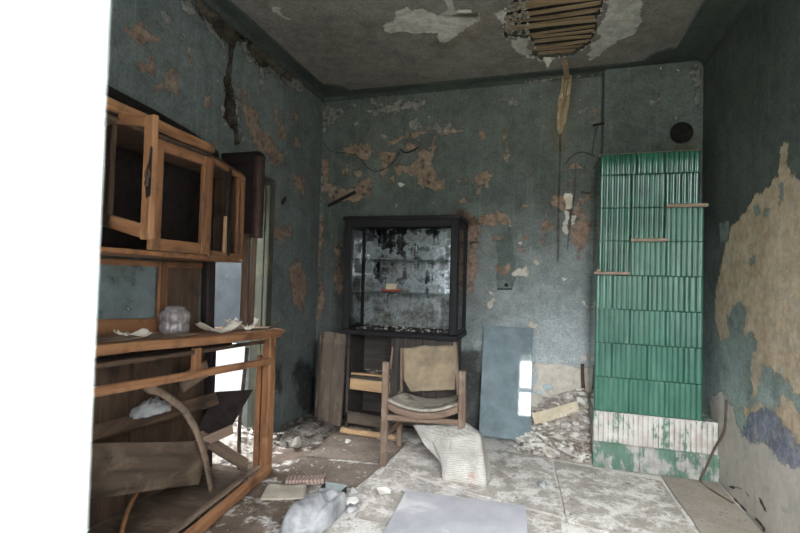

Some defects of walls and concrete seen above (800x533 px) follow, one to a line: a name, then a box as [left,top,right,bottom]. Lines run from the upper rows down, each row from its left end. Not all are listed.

peeling [124,21,183,95]
crack [181,0,304,146]
peeling [242,89,287,166]
peeling [382,0,481,43]
peeling [510,38,533,58]
spalling [557,59,599,134]
peeling [586,0,644,61]
peeling [316,95,463,320]
peeling [540,162,593,260]
peeling [495,259,539,278]
peeling [709,142,800,533]
flaking render [531,353,589,413]